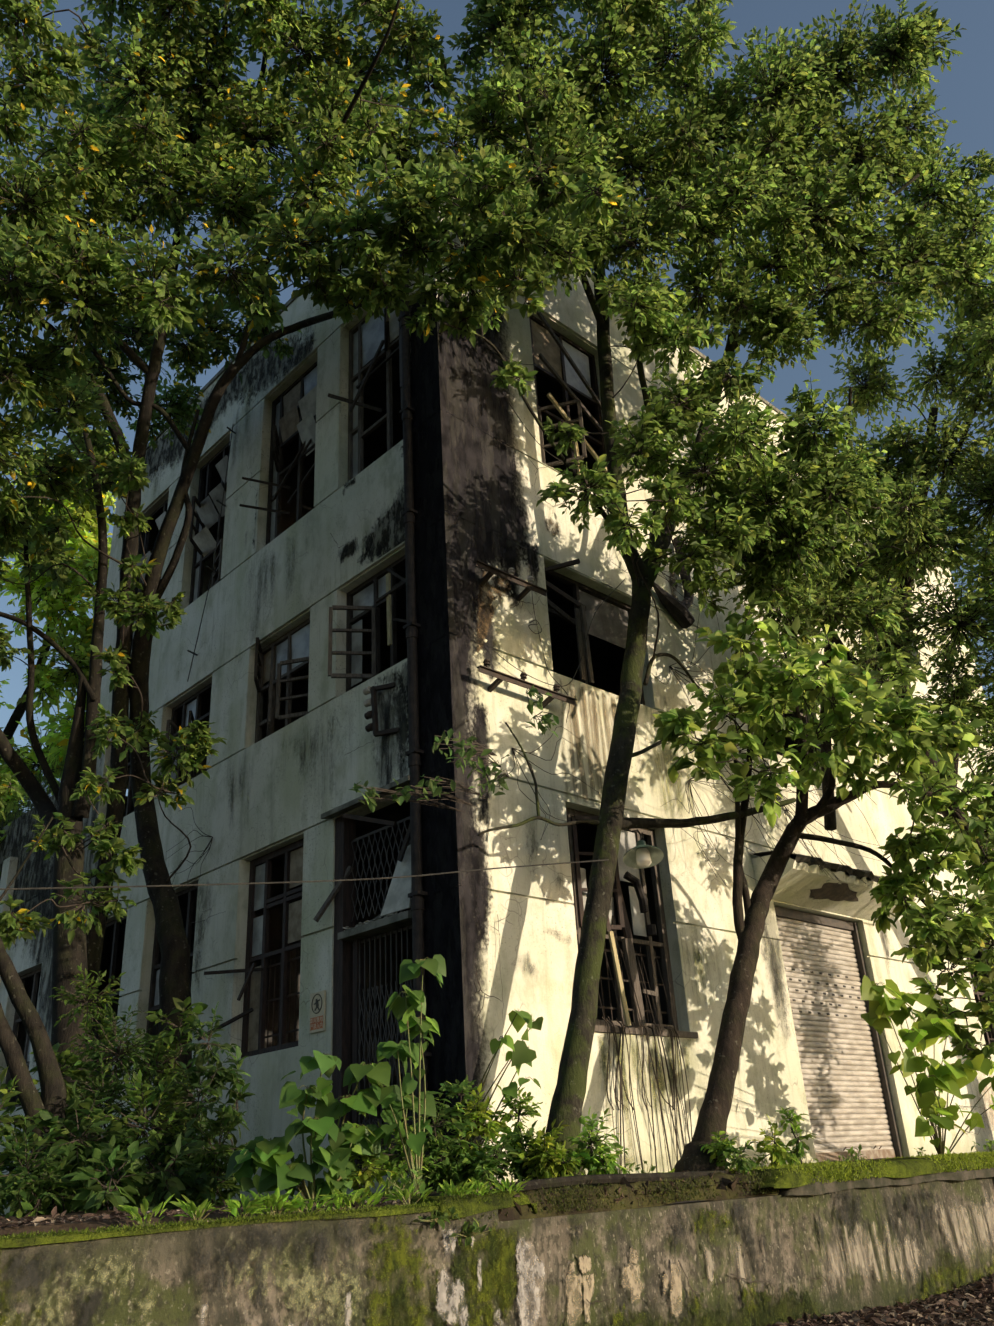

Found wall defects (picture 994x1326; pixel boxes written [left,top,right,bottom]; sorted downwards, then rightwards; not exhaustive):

damp [145,331,314,487]
damp [339,433,416,564]
damp [545,517,560,536]
damp [500,540,540,605]
damp [476,600,500,679]
damp [469,704,491,944]
damp [190,1220,368,1326]
efflorescence [436,1260,482,1326]
damp [516,1240,545,1326]
spalling [562,1254,594,1326]
spalling [620,1245,642,1303]
spalling [659,1259,682,1318]